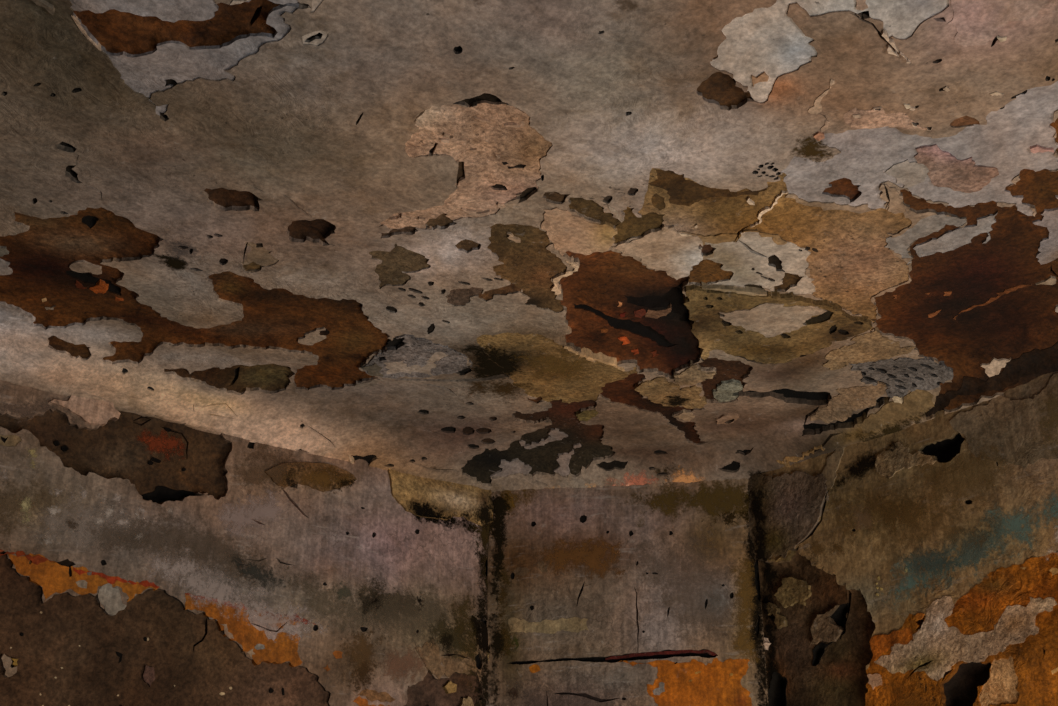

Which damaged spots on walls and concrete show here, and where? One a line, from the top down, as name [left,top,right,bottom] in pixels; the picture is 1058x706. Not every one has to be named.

peeling [696,0,949,111]
spalling [0,76,1058,486]
spalling [0,409,232,505]
spalling [0,549,331,706]
leakage [91,444,535,706]
leakage [632,462,781,706]
spalling [748,445,1057,706]